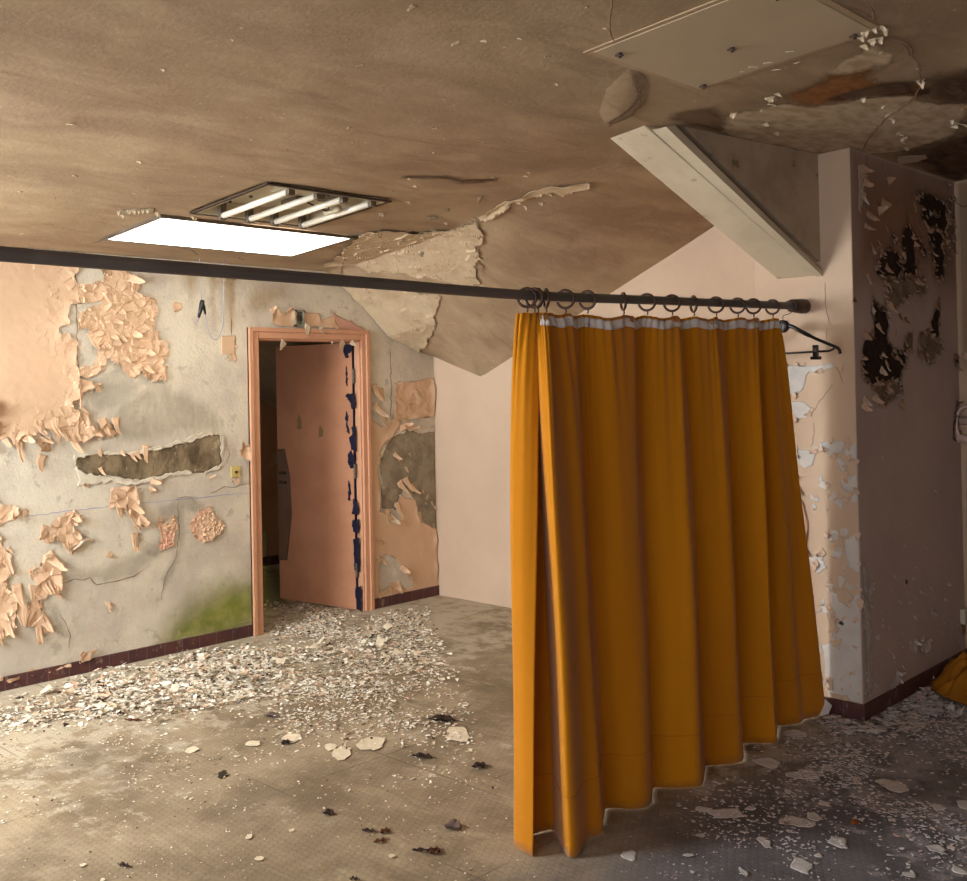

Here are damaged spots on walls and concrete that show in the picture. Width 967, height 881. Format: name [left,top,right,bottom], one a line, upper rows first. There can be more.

rust [789,69,919,106]
peeling [827,26,893,76]
damp [908,134,967,176]
peeling [324,183,591,286]
peeling [722,67,967,412]
peeling [343,287,441,354]
peeling [0,262,225,552]
peeling [787,362,834,423]
peeling [371,378,439,599]
peeling [796,436,860,534]
peeling [0,504,94,646]
peeling [809,527,864,717]